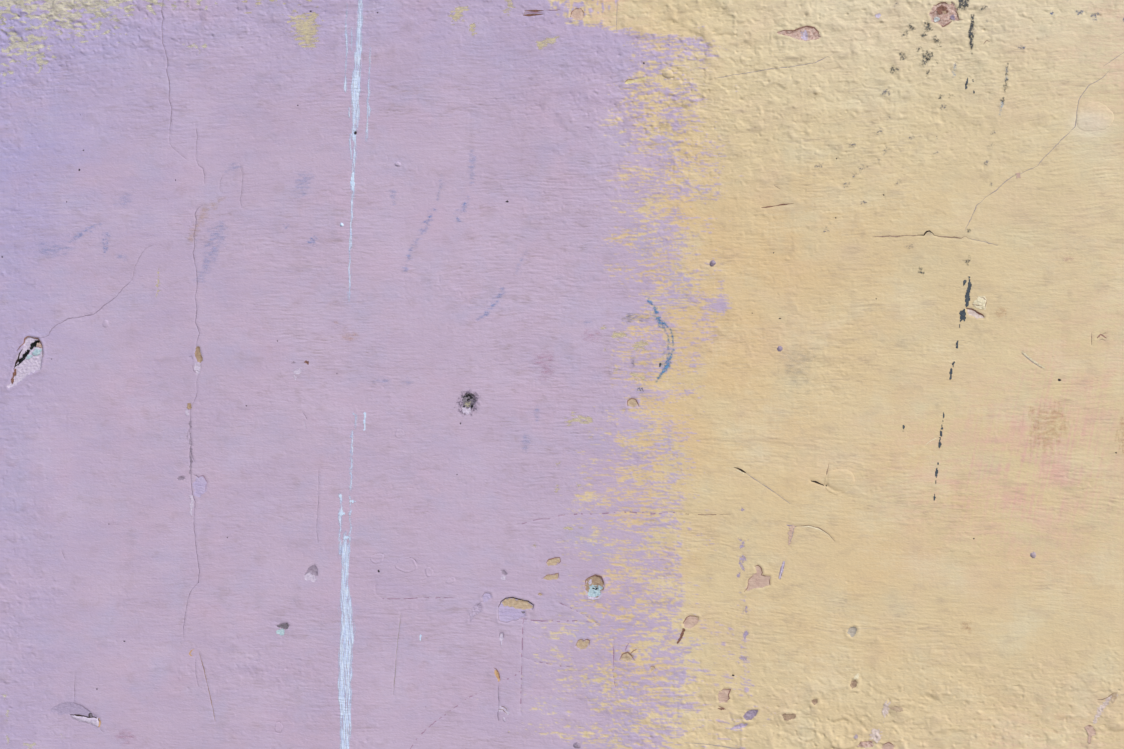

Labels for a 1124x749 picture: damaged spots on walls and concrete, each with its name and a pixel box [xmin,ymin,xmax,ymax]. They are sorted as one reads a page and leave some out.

peeling [777,25,821,41]
spalling [929,1,963,27]
crack [161,0,243,345]
crack [874,53,1123,244]
crack [41,247,148,338]
spalling [7,336,43,388]
flaking render [461,393,476,415]
crack [183,378,215,719]
spalling [544,557,561,580]
peeling [737,540,771,592]
peeling [498,593,542,647]
peeling [51,701,102,731]